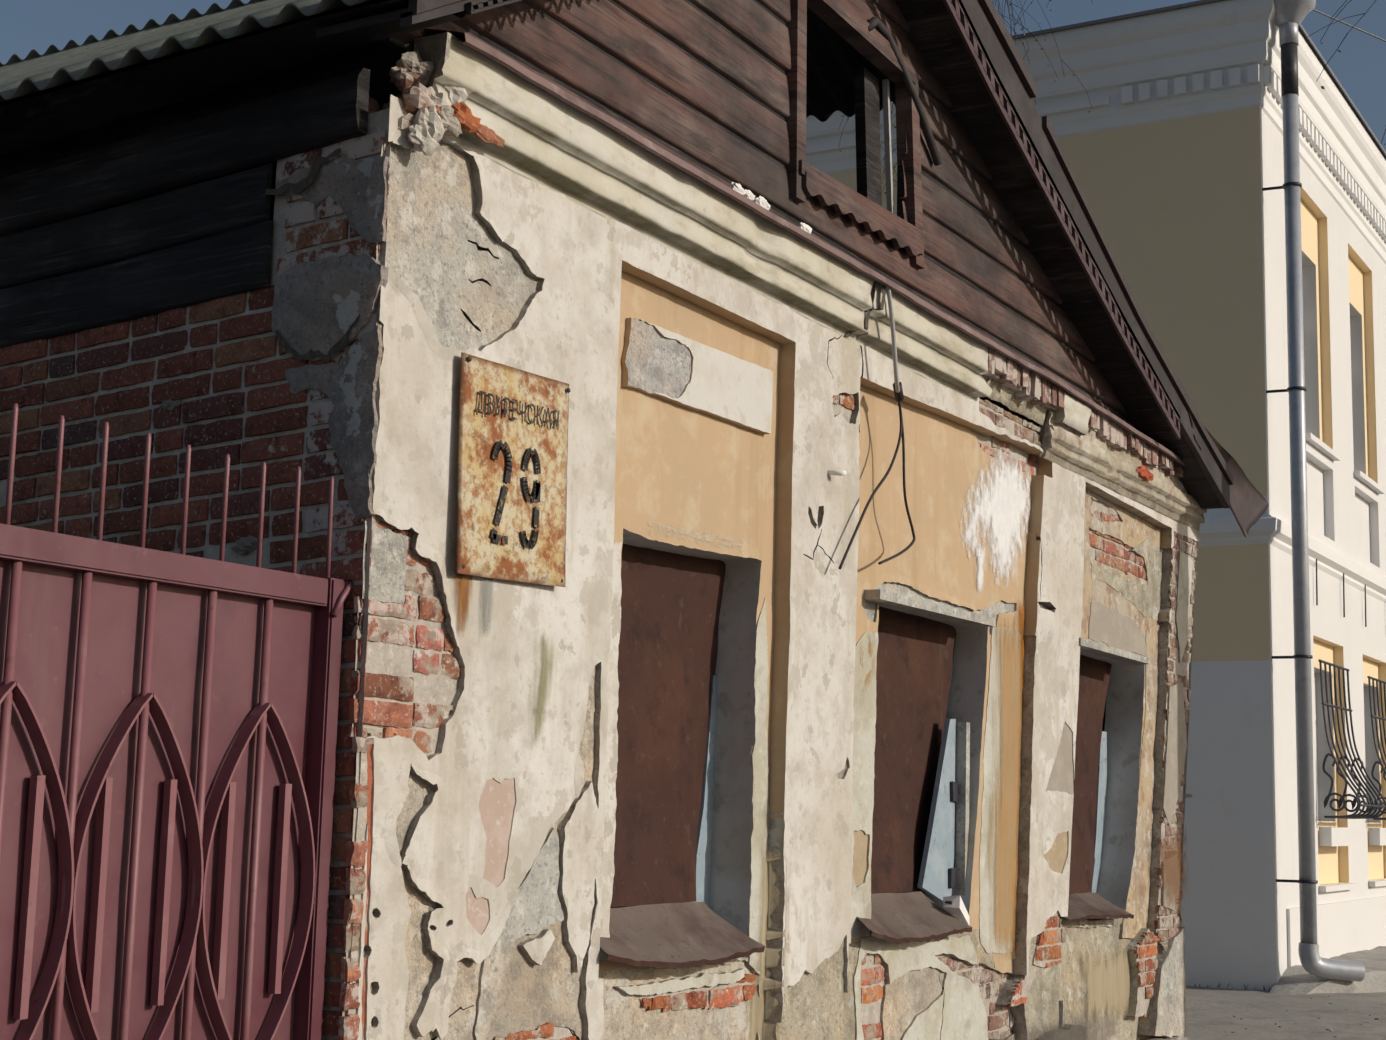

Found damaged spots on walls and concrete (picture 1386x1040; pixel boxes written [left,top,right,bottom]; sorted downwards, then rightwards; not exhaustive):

spalling [276,51,545,362]
flaking render [827,393,859,428]
flaking render [972,399,1053,478]
spalling [1136,465,1154,482]
spalling [808,506,824,529]
flaking render [1089,497,1148,581]
rust [456,573,472,630]
peeling [285,317,760,1040]
flaking render [776,531,1198,1040]